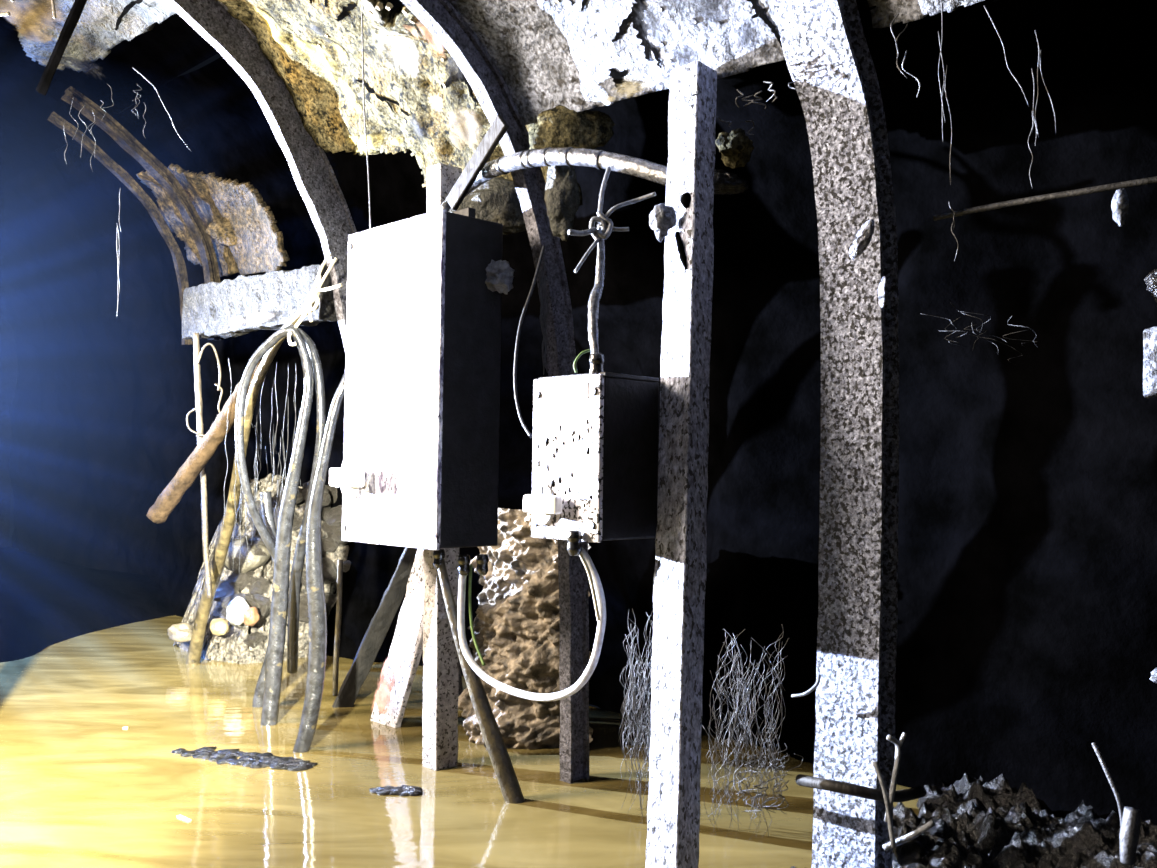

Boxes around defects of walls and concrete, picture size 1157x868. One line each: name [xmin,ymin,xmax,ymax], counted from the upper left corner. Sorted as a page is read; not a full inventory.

spalling [362,0,417,24]
crack [545,0,587,11]
crack [747,0,782,47]
crack [608,0,662,92]
spalling [440,57,460,88]